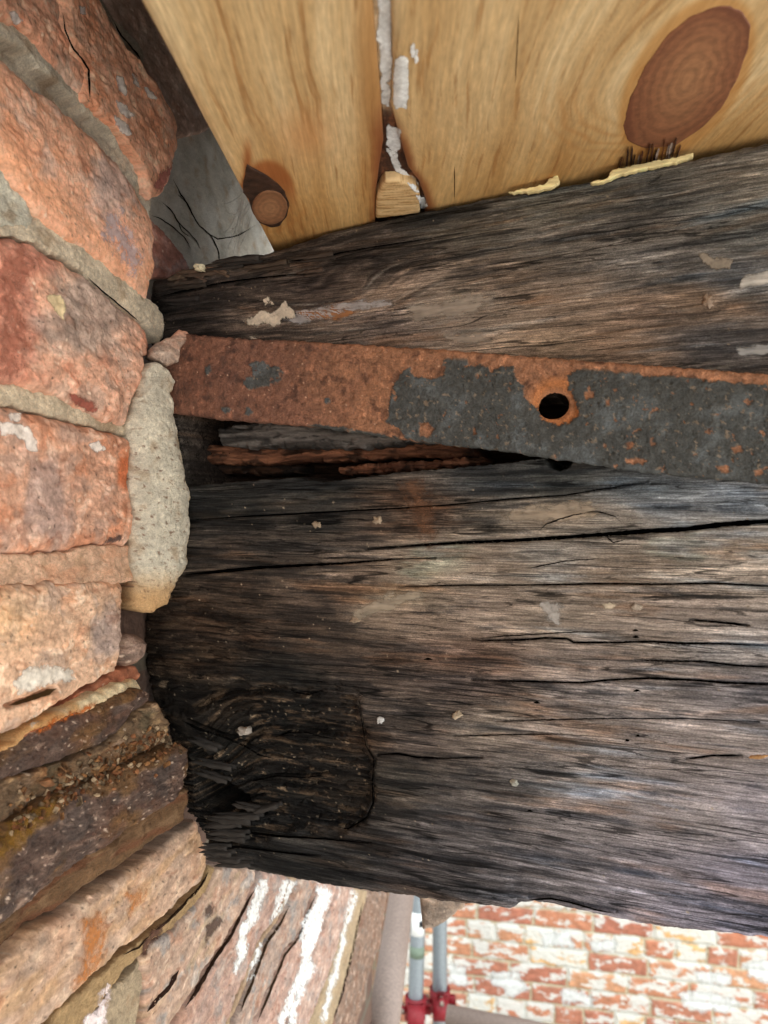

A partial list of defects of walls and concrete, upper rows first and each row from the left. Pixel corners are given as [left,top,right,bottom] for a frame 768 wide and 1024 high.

crack [63,17,90,95]
crack [154,183,301,296]
crack [334,238,431,255]
crack [184,481,768,587]
crack [475,620,768,685]
crack [183,721,332,781]
crack [228,702,749,856]